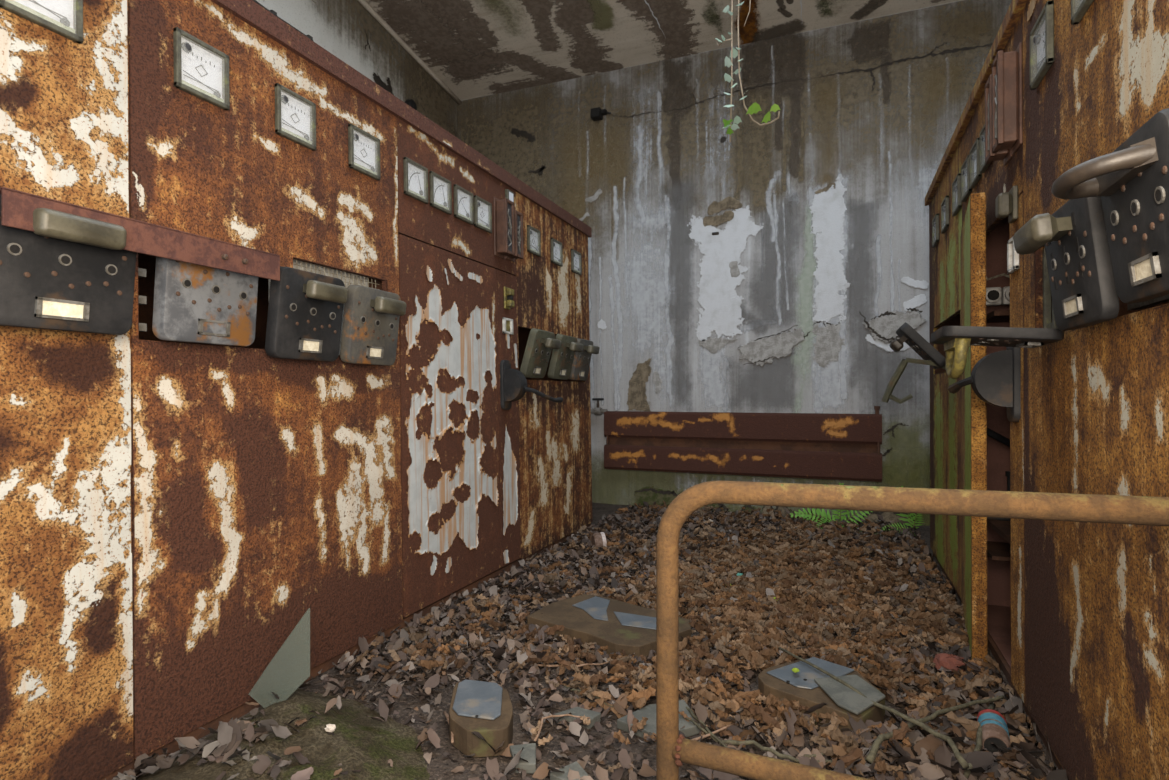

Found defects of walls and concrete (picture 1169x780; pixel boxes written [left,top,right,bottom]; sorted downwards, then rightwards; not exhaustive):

water stain [317,0,1005,413]
flaking render [687,196,763,353]
flaking render [809,176,851,368]